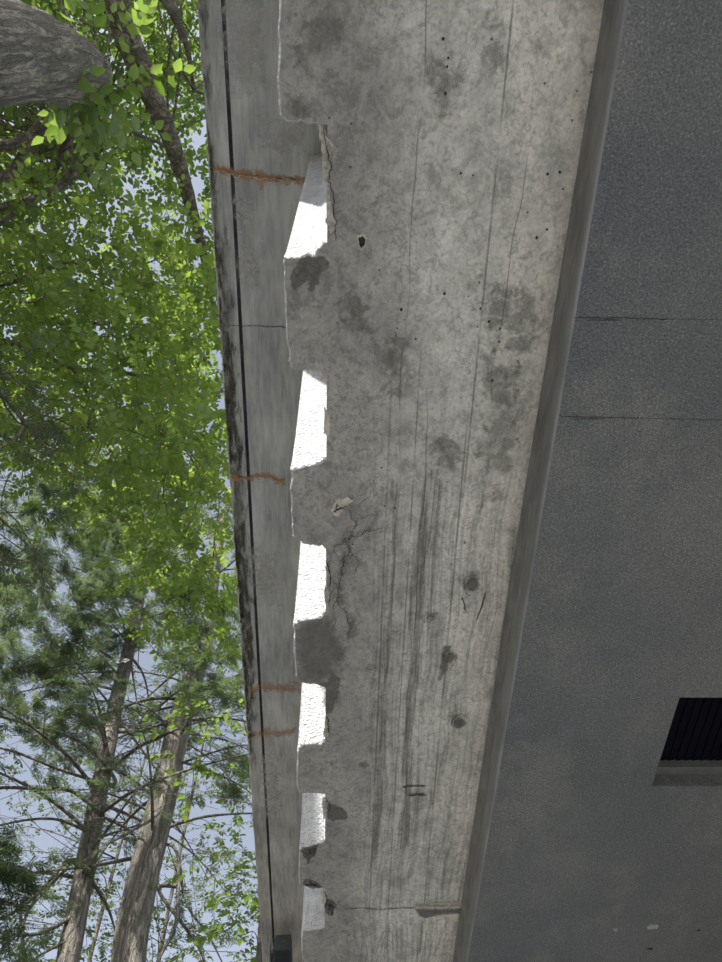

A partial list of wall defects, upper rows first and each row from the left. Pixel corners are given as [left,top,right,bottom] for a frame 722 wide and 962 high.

crack [328,476,380,636]